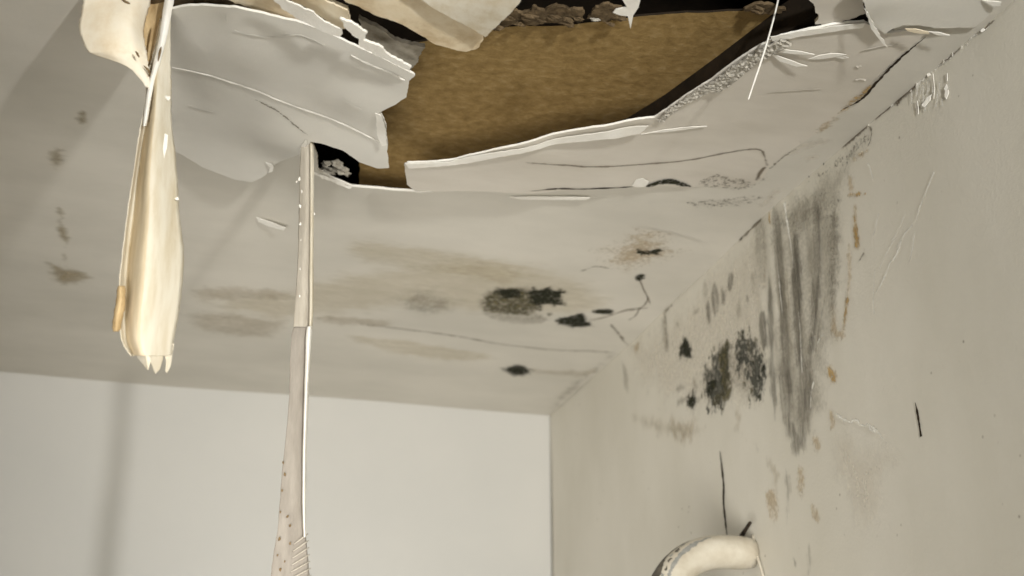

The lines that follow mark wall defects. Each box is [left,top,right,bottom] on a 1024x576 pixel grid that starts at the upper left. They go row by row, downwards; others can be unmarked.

peeling [613,0,640,29]
peeling [863,0,1001,114]
crack [842,38,924,146]
spalling [510,178,691,200]
mould [484,286,638,328]
crack [611,299,672,348]
mould [506,365,530,376]
mould [686,327,767,415]